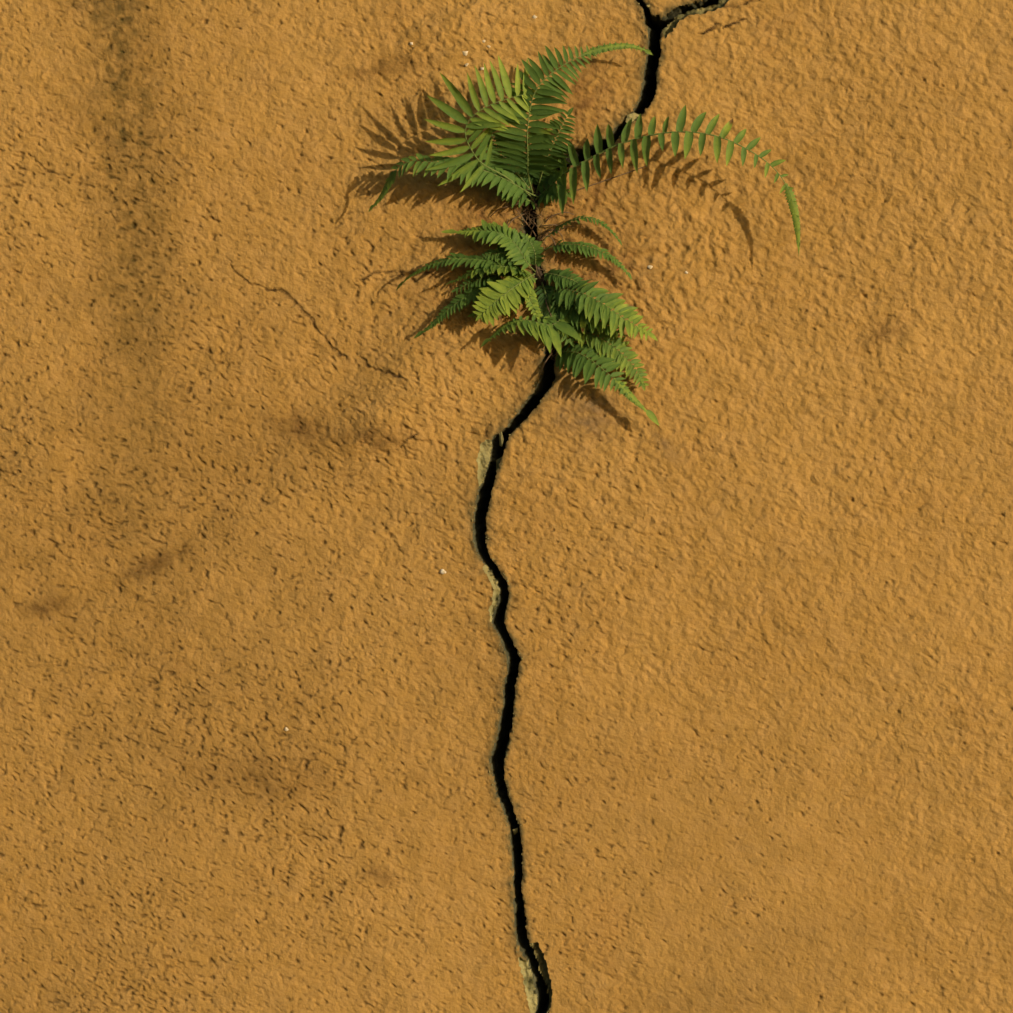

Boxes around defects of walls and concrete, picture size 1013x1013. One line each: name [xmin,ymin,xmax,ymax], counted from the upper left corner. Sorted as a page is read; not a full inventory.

crack [521,0,752,285]
crack [471,311,556,1013]